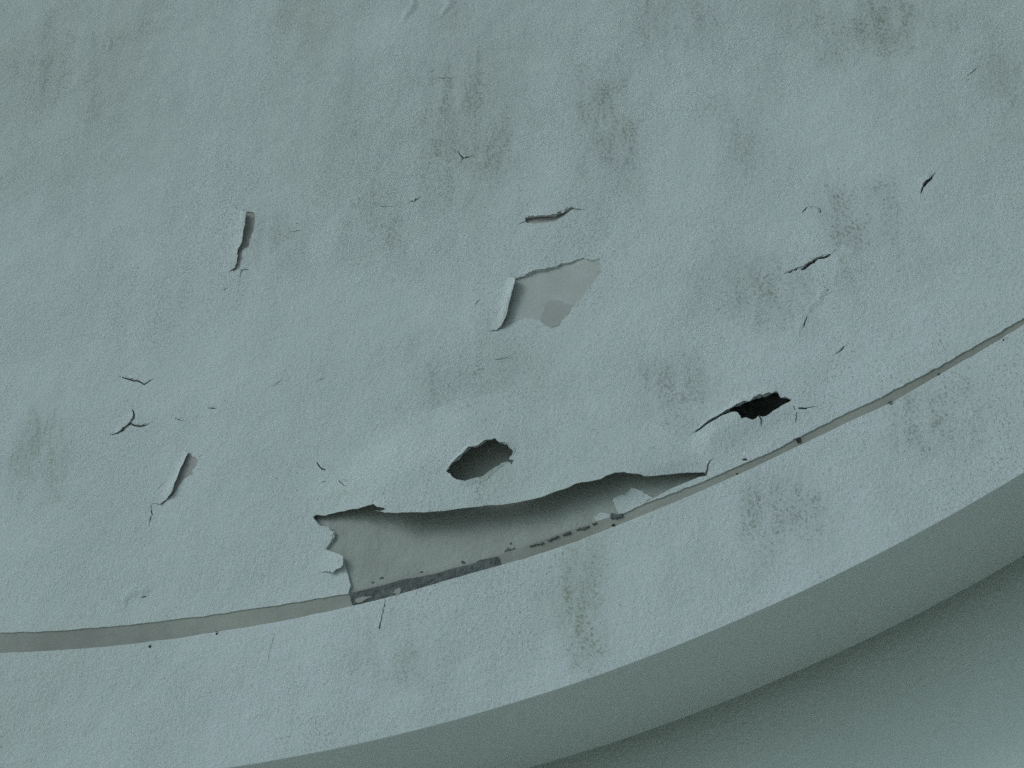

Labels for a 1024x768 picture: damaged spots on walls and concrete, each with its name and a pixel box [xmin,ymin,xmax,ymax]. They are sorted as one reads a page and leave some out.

peeling [224,206,255,272]
peeling [488,259,602,332]
crack [784,247,836,273]
crack [110,369,155,435]
peeling [150,449,198,521]
peeling [303,384,791,605]